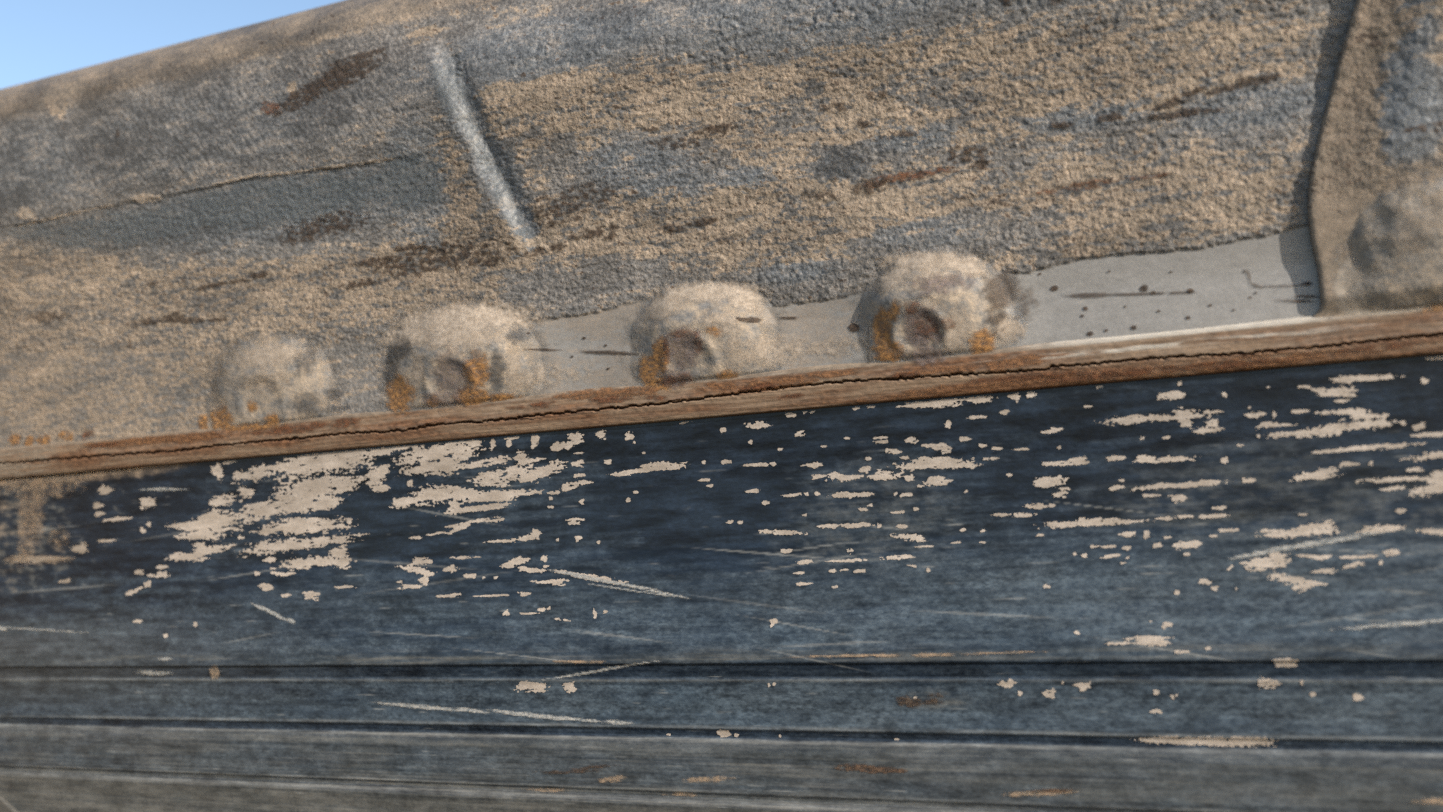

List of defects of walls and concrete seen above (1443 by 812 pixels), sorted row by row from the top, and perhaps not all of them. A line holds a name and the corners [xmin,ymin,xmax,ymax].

peeling [5,539,117,564]
peeling [93,430,628,621]
peeling [604,431,783,502]
peeling [744,392,1037,588]
peeling [1104,620,1211,654]
peeling [951,374,1443,593]